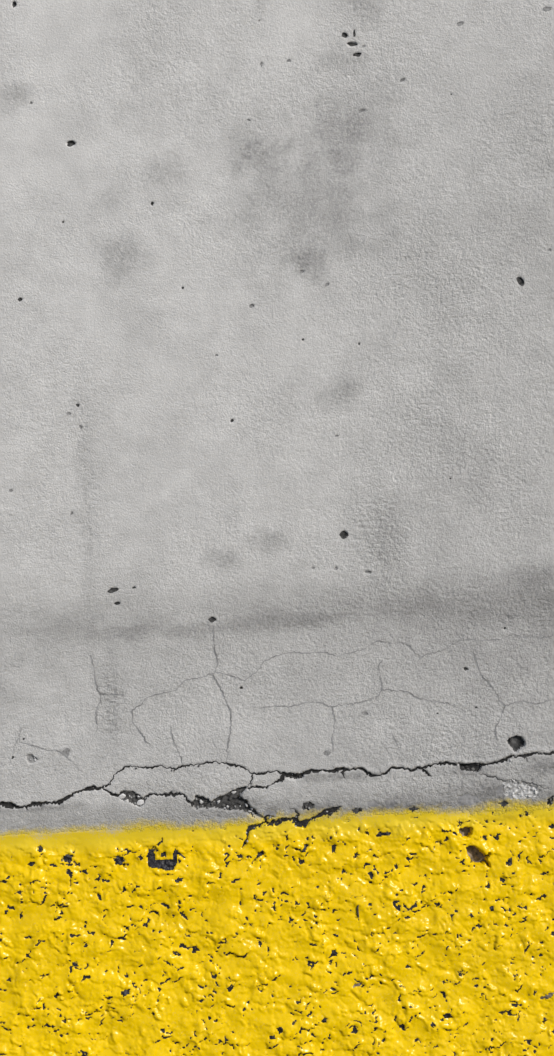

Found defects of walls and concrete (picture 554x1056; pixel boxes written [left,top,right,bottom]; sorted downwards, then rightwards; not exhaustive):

crack [0,605,554,809]
crack [242,807,338,848]